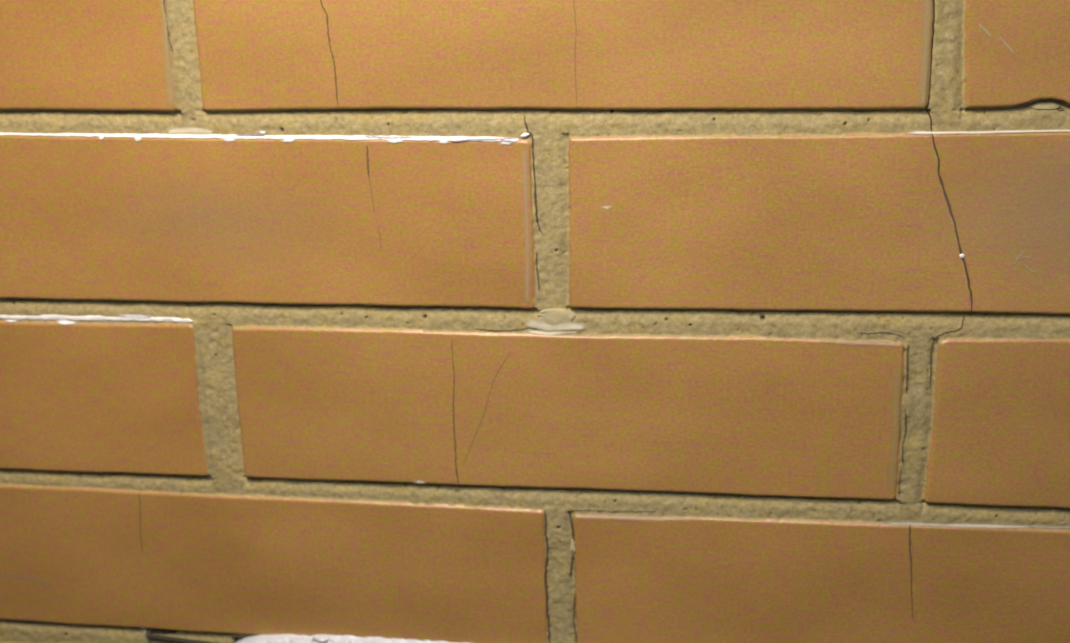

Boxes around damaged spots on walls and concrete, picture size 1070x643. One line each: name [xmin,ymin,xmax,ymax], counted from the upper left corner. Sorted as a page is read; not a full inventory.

crack [320,0,338,107]
crack [856,0,972,494]
crack [451,327,535,485]